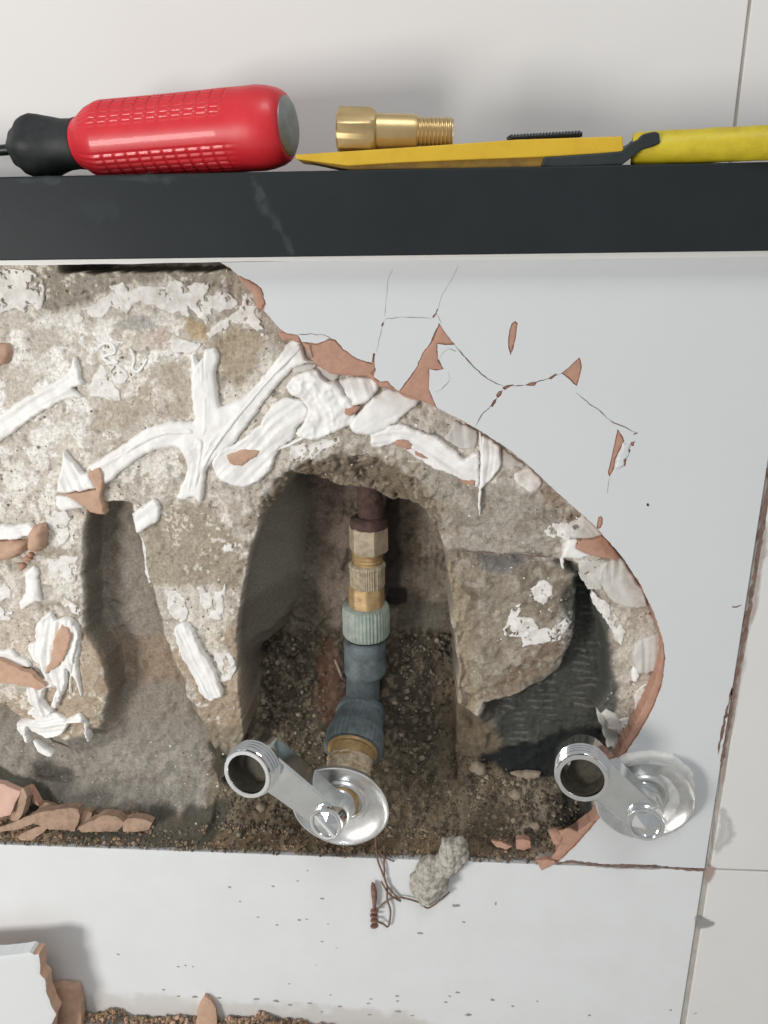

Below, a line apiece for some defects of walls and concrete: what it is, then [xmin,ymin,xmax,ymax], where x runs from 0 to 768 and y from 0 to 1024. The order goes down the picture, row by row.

peeling [0,268,45,314]
crack [376,269,457,351]
peeling [72,275,454,408]
crack [436,347,560,426]
crack [578,394,638,435]
peeling [227,449,259,466]
peeling [64,467,110,515]
peeling [531,580,553,605]
peeling [544,516,627,645]
peeling [45,624,73,673]
peeling [503,604,569,647]
spalling [596,641,665,752]